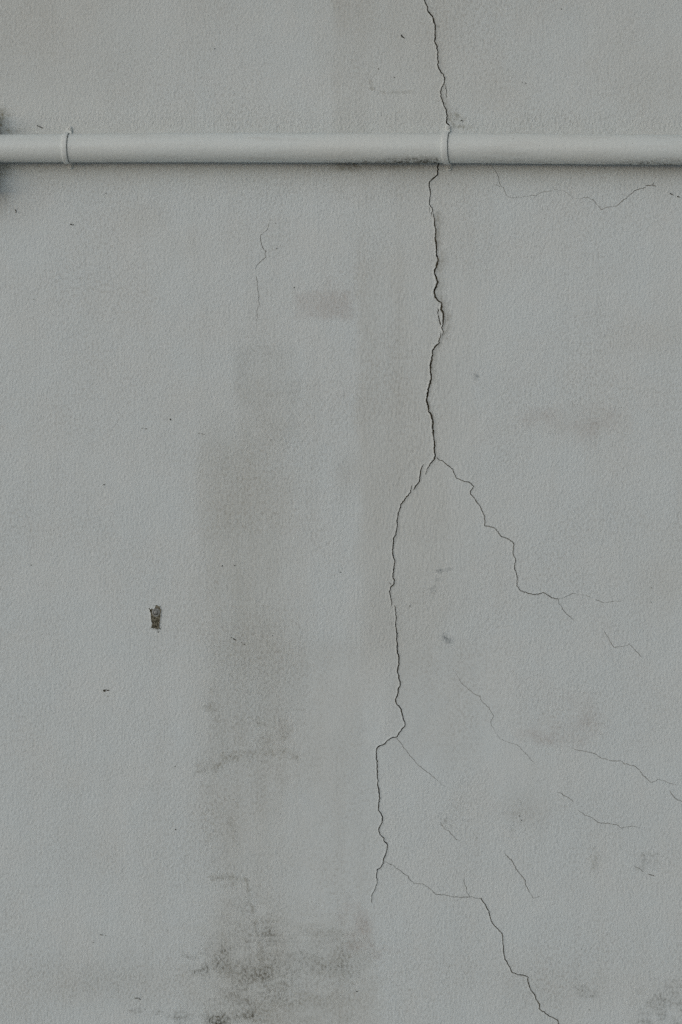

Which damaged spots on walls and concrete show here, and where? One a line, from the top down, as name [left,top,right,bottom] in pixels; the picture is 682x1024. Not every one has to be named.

crack [422,0,452,133]
spalling [148,604,162,633]
crack [370,163,613,1024]